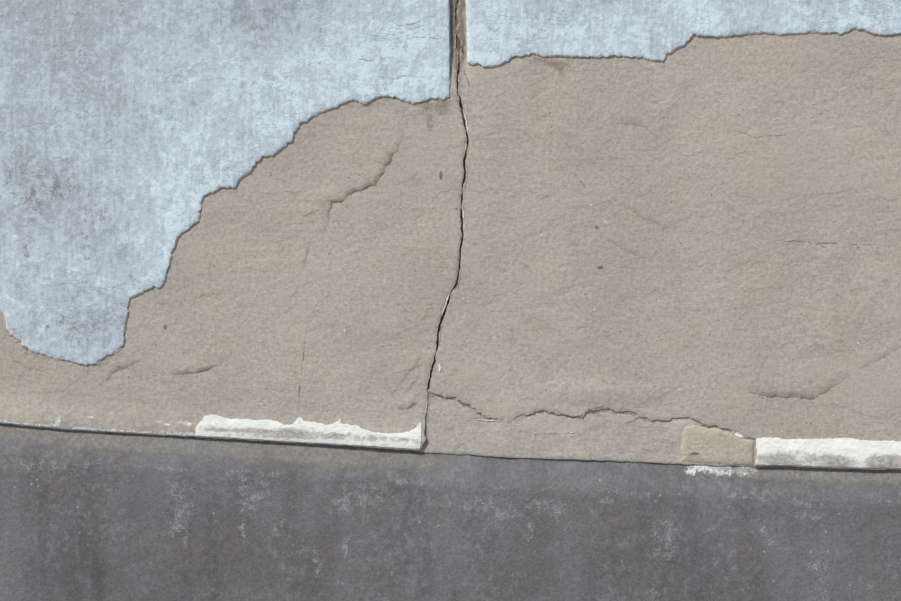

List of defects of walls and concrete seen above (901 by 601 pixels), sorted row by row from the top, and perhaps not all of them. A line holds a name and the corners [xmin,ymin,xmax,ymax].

peeling [0,0,901,470]
crack [526,408,665,423]